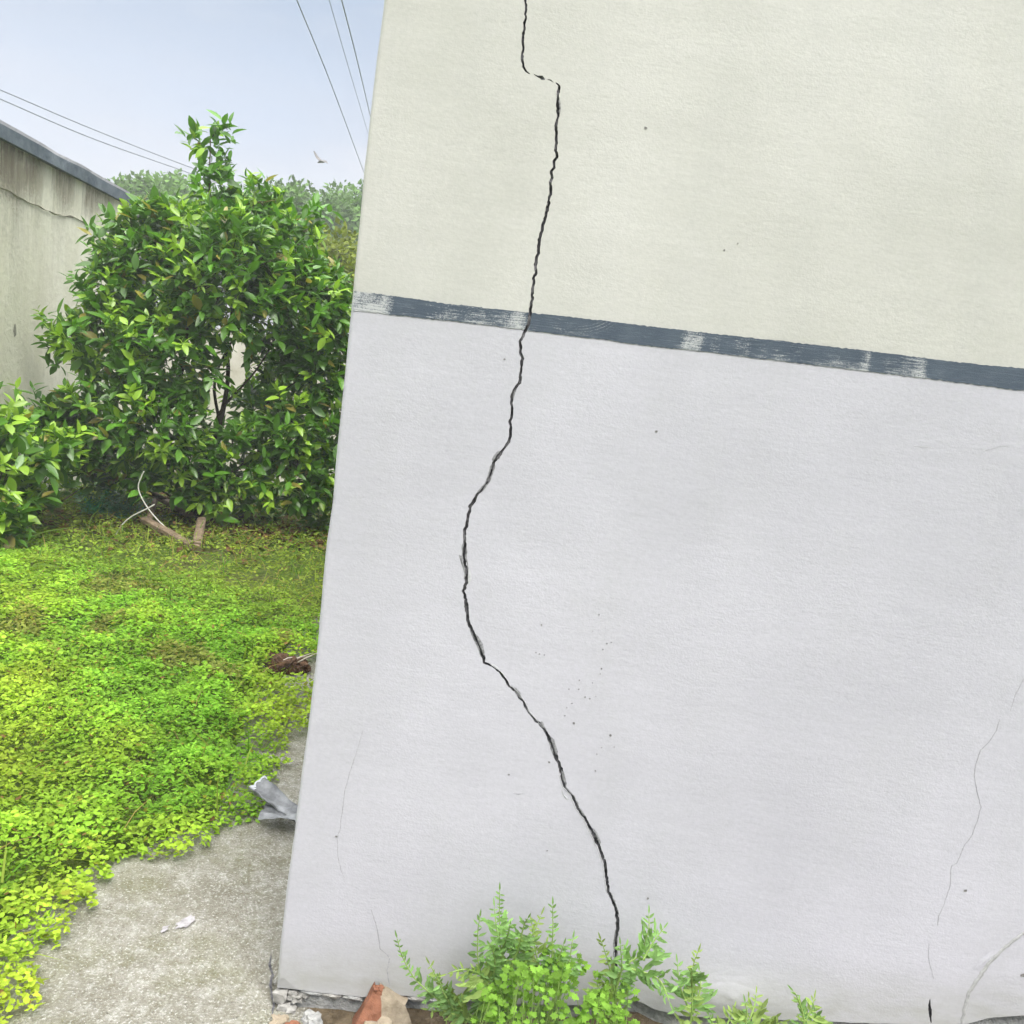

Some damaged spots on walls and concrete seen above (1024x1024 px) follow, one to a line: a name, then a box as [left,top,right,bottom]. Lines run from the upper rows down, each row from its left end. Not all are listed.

crack [459,0,621,1005]